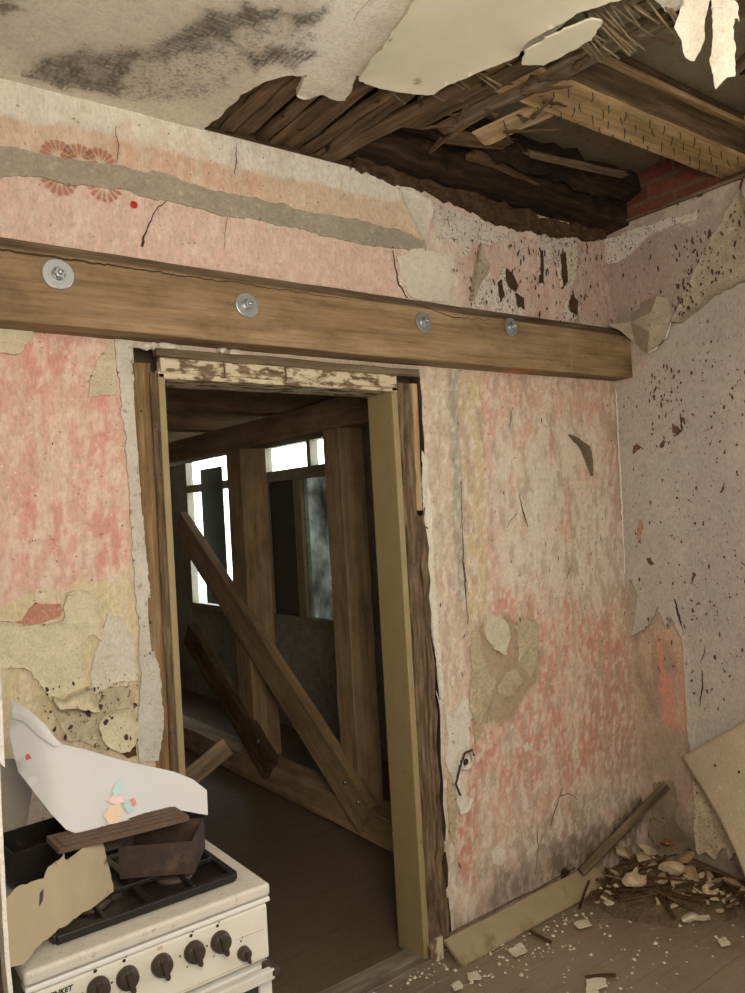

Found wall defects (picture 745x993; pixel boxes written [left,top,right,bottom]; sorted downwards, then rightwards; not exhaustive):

mould [21,1,329,100]
peeling [359,0,621,95]
crack [0,200,350,300]
flaking render [0,146,699,322]
peeling [0,328,33,355]
peeling [0,590,139,758]
flaking render [421,451,540,846]
flaking render [0,777,13,993]